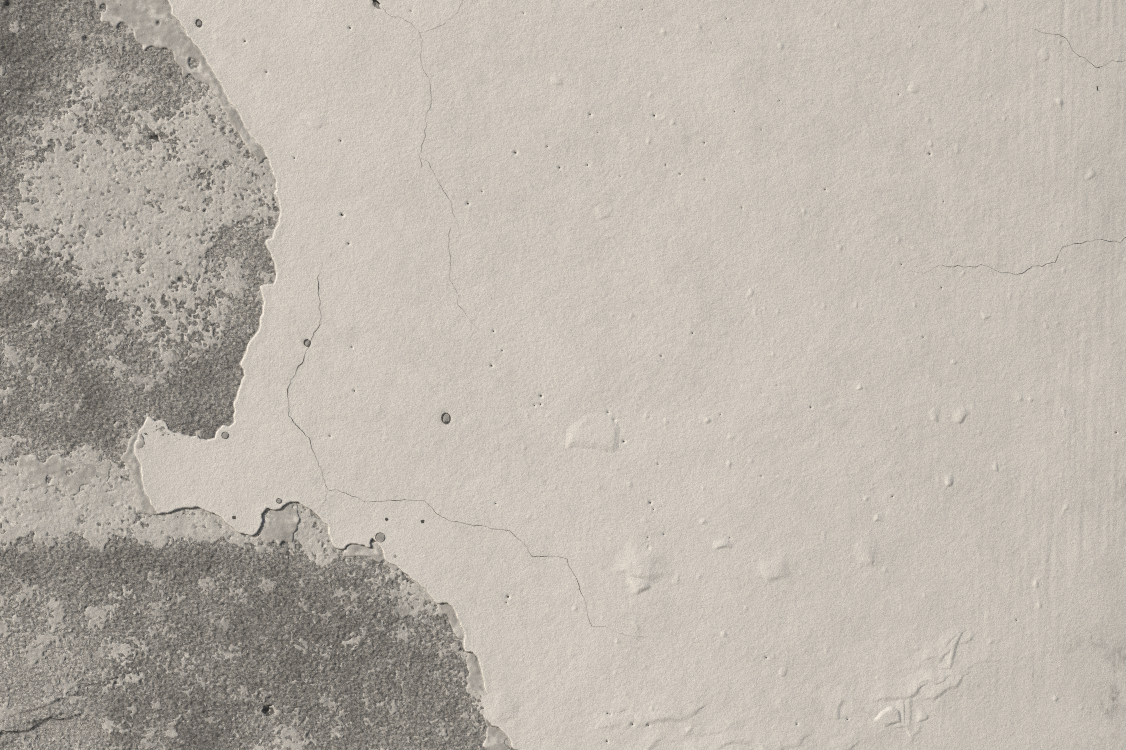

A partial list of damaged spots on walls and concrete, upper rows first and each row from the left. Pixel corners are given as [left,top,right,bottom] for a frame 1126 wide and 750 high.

peeling [0,0,513,750]